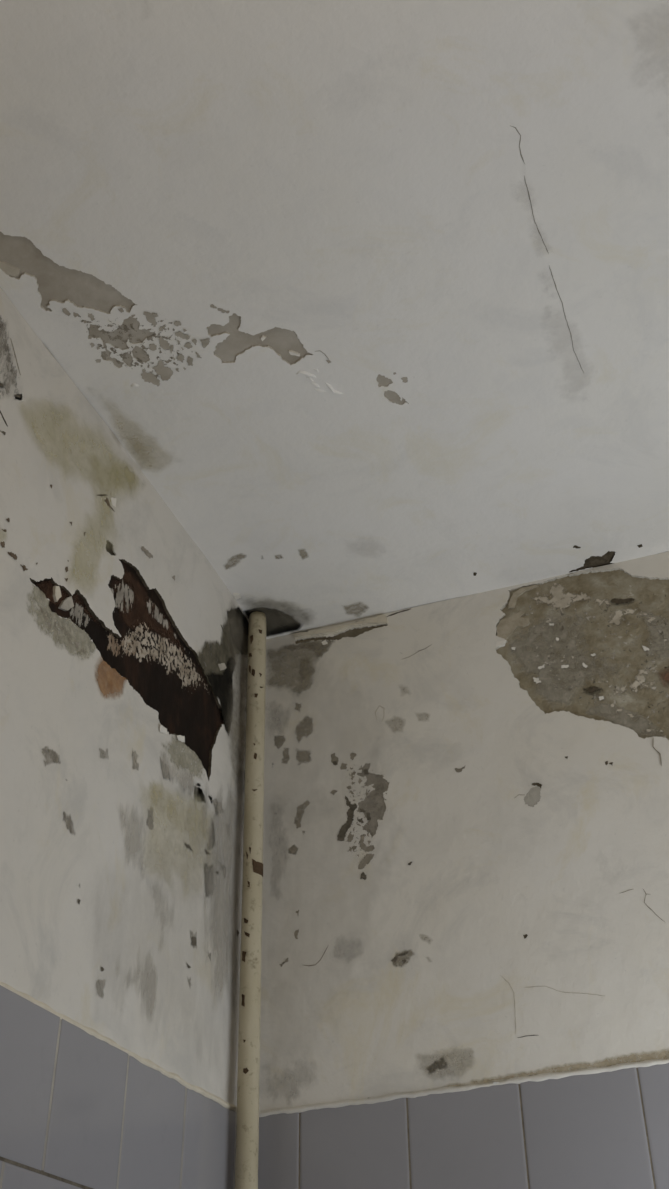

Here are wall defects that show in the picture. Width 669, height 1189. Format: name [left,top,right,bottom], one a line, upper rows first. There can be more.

spalling [0,319,21,398]
spalling [0,232,331,386]
crack [511,126,584,373]
leakage [29,586,95,655]
spalling [1,518,224,777]
leakage [196,593,308,775]
spalling [496,545,669,765]
leakage [160,738,203,790]
peeling [330,753,390,880]